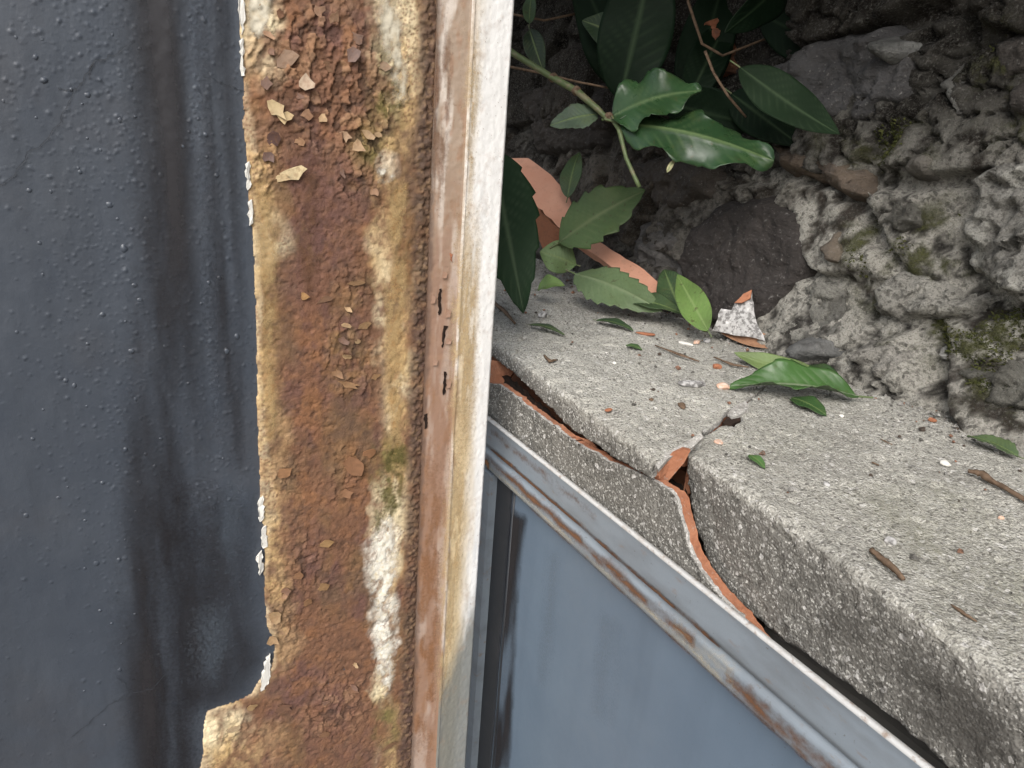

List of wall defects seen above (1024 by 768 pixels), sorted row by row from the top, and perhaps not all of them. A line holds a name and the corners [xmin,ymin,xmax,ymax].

peeling [238,0,246,76]
peeling [244,161,254,226]
corrosion [200,0,462,768]
crack [502,375,620,461]
peeling [256,496,268,575]
corrosion [485,445,675,608]
crack [668,478,708,559]
peeling [260,654,271,691]
corrosion [669,621,719,647]